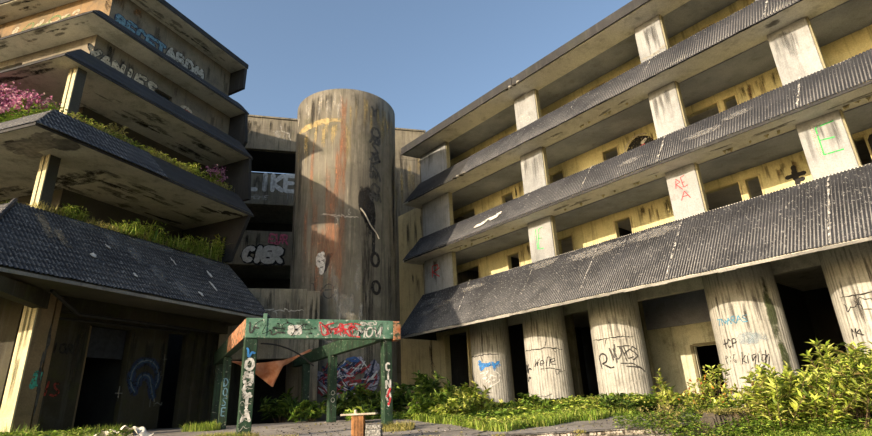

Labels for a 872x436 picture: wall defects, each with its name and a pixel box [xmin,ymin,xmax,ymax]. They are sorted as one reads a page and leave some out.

peeling [450,211,502,250]